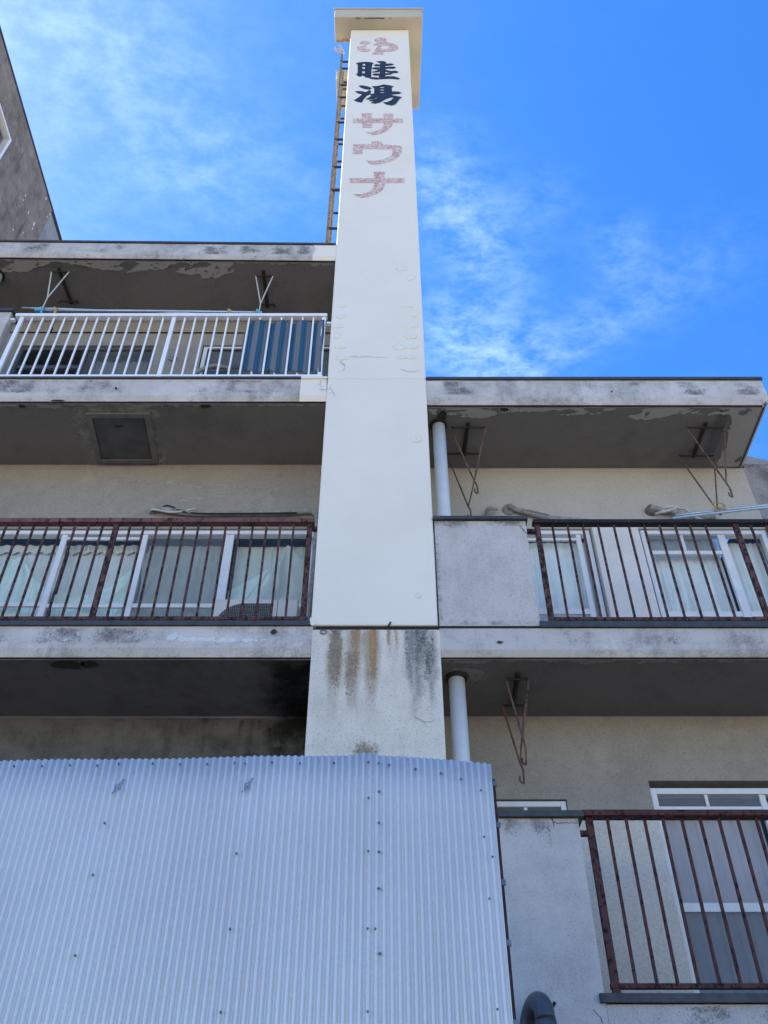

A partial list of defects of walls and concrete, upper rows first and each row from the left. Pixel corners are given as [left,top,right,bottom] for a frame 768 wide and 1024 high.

peeling [1,260,334,279]
peeling [428,408,616,421]
corrosion [352,630,397,673]